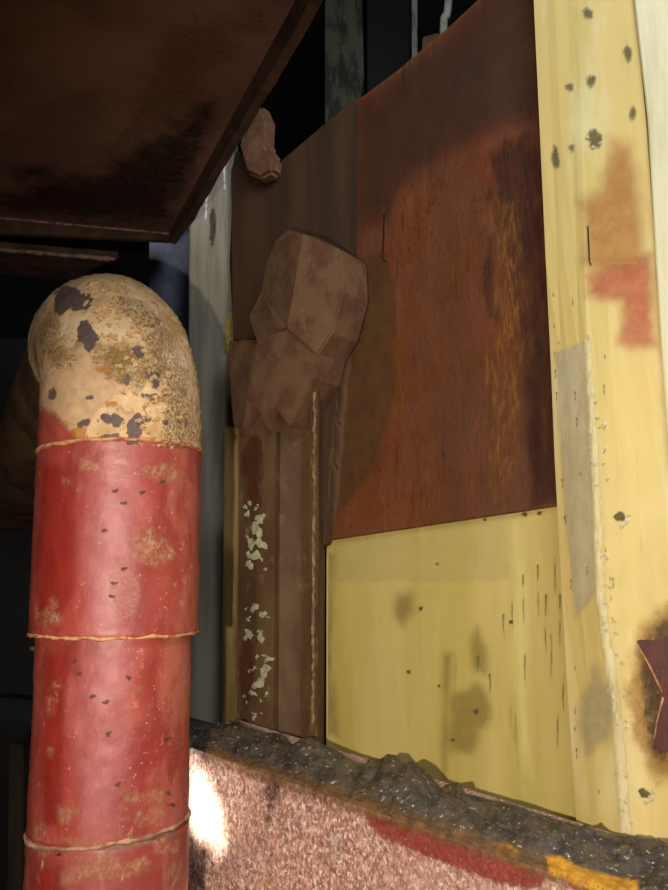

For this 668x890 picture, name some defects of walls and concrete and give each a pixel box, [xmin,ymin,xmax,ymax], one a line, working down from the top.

peeling [54,277,183,450]
rust [484,137,556,503]
peeling [243,501,267,571]
peeling [243,604,275,721]
leakage [454,689,486,748]
rust [631,652,668,774]